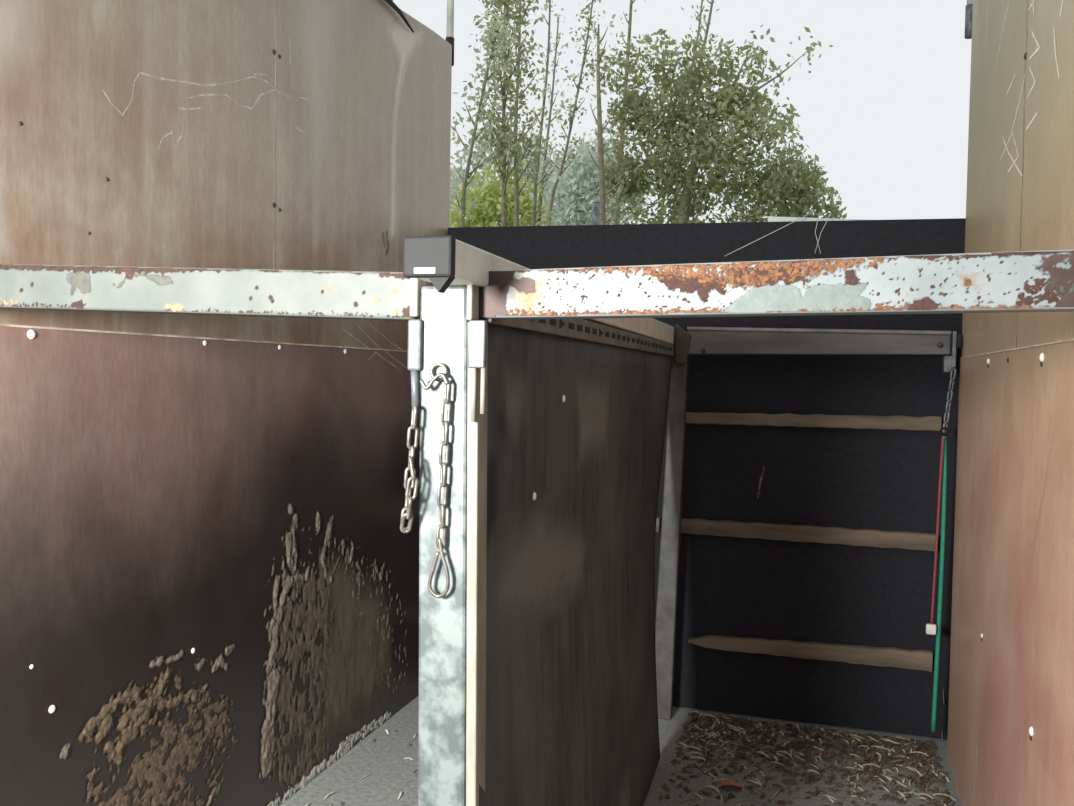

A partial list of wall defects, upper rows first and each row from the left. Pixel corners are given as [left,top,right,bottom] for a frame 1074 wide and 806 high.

peeling [66,272,91,295]
rust [498,251,1072,316]